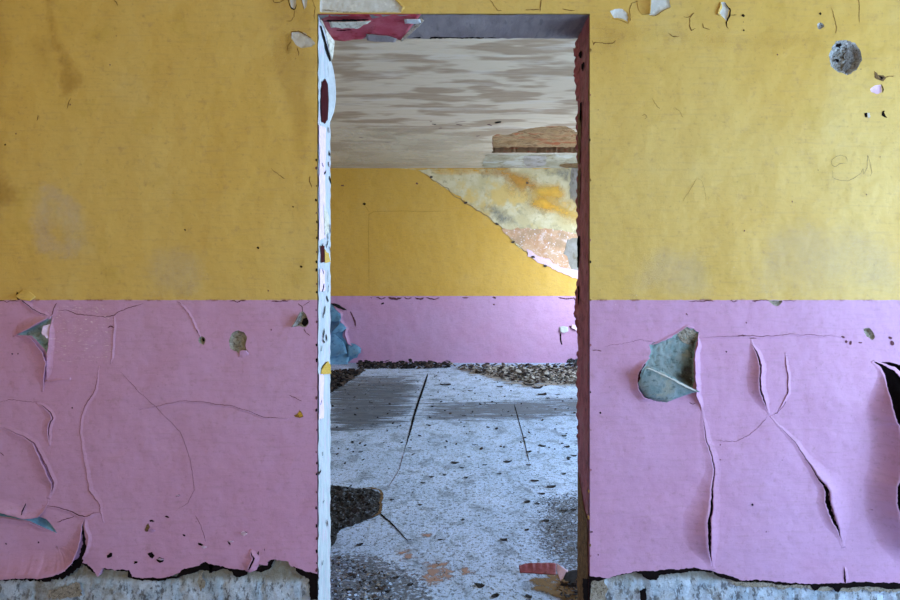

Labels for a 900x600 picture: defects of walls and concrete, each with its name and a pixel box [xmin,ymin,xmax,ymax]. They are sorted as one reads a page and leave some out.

spalling [829,40,862,75]
peeling [273,0,424,346]
peeling [405,38,592,336]
crack [321,230,331,351]
crack [0,300,322,538]
peeling [315,303,361,431]
crack [389,374,428,486]
peeling [629,313,704,411]
crack [682,334,852,583]
peeling [863,360,900,571]
peeling [0,499,319,600]
peeling [519,475,900,600]